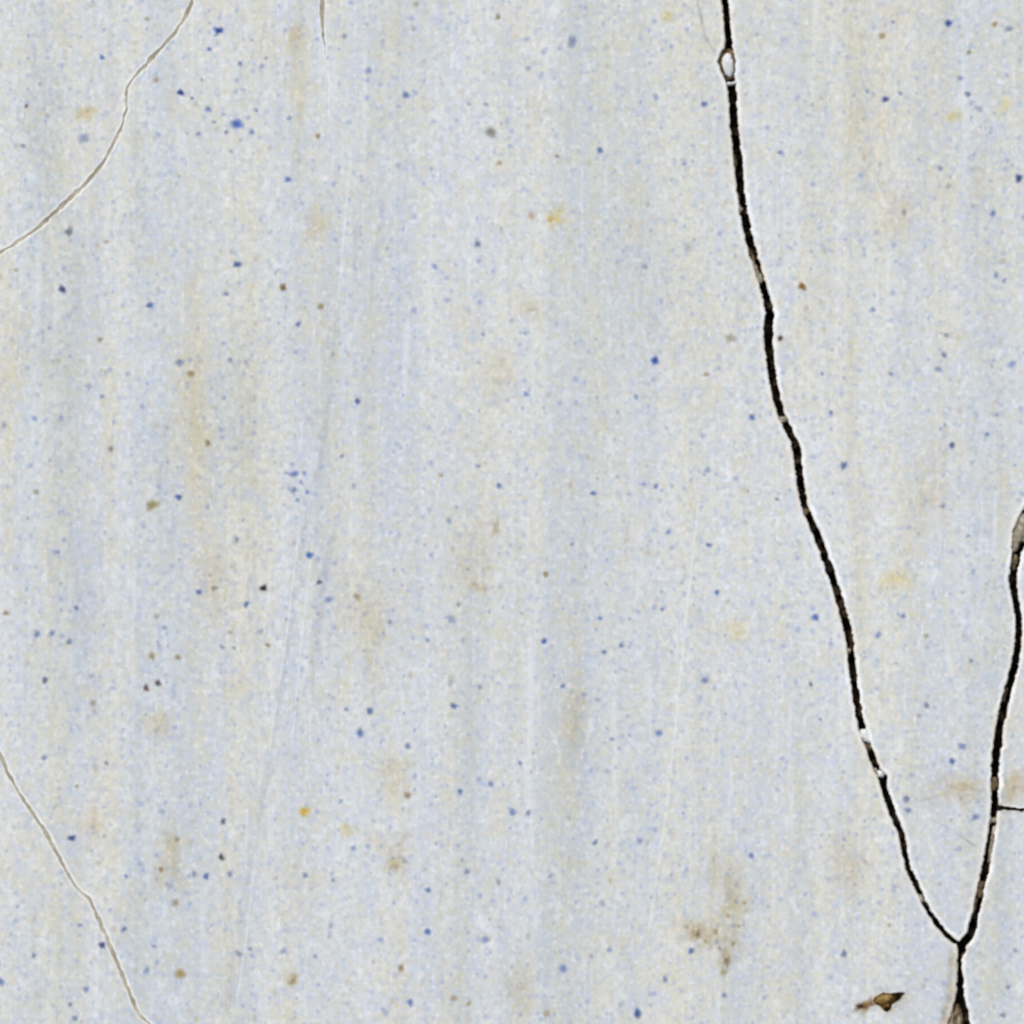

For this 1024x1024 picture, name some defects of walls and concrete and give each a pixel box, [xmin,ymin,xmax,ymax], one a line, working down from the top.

crack [0,0,196,256]
crack [713,0,1024,1024]
crack [0,747,153,1024]